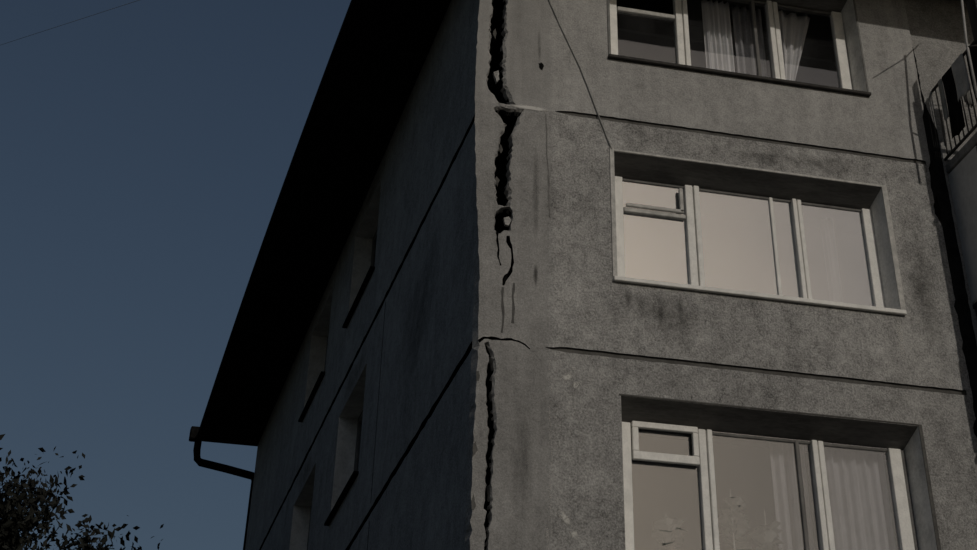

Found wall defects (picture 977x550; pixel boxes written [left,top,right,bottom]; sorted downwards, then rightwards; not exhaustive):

crack [477,0,550,550]